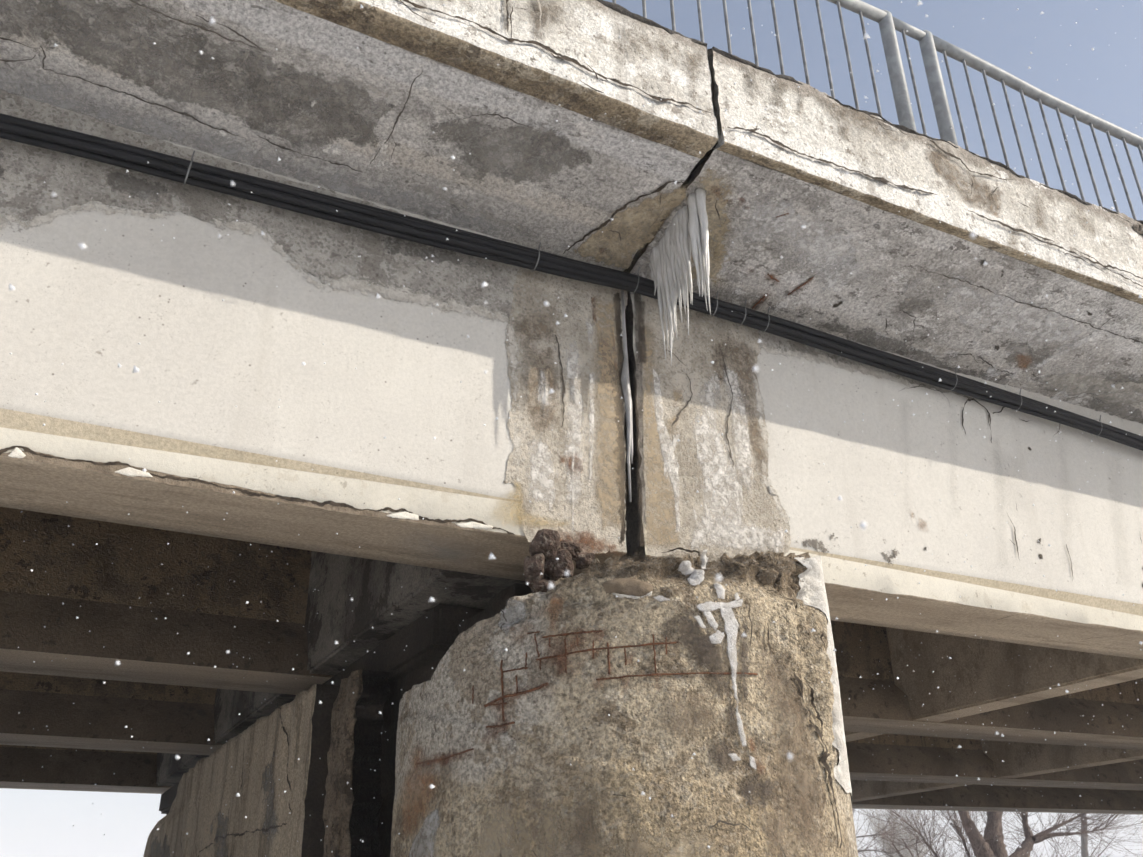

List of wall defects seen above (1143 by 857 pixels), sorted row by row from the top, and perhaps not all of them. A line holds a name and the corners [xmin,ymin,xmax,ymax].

crack [0,37,423,172]
flaking render [0,89,432,222]
water stain [0,0,525,232]
water stain [382,236,475,266]
water stain [425,117,591,198]
crack [563,181,687,254]
crack [400,0,937,195]
crack [856,110,1143,287]
flaking render [0,138,1016,804]
rust [423,752,462,766]
water stain [662,608,750,770]
crack [662,547,849,857]